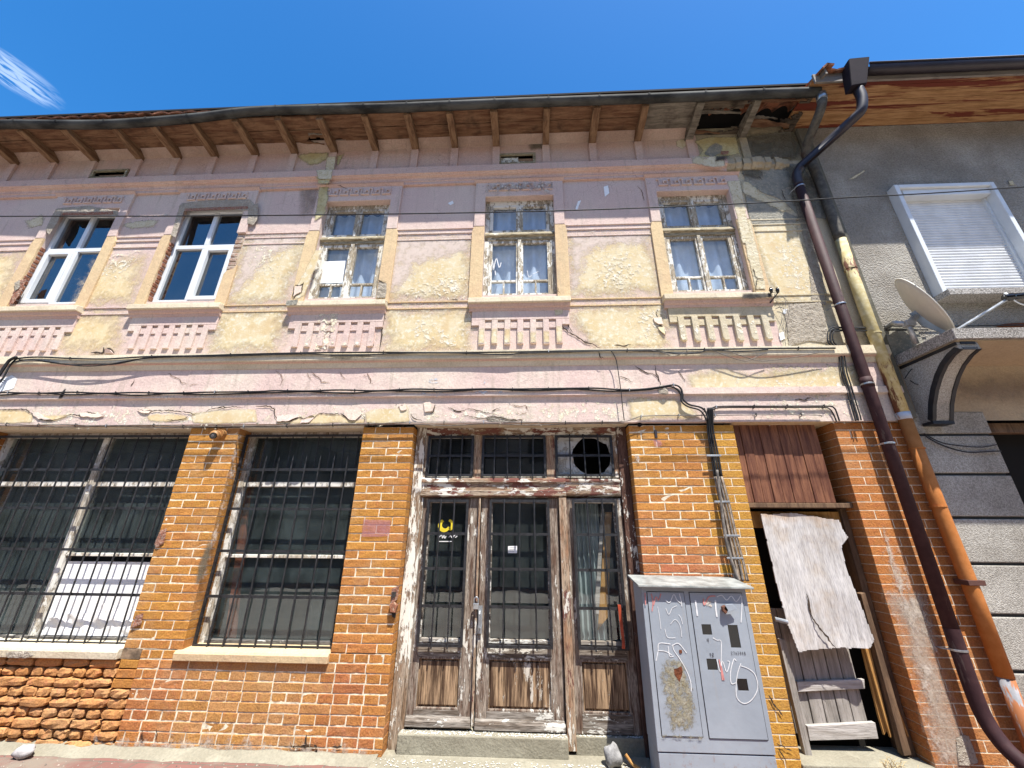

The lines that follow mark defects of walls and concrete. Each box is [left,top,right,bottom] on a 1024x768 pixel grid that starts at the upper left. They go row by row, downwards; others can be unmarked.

spalling [692,137,739,167]
peeling [0,247,46,305]
peeling [60,199,322,353]
peeling [331,231,773,351]
peeling [727,131,830,346]
peeling [0,397,697,431]